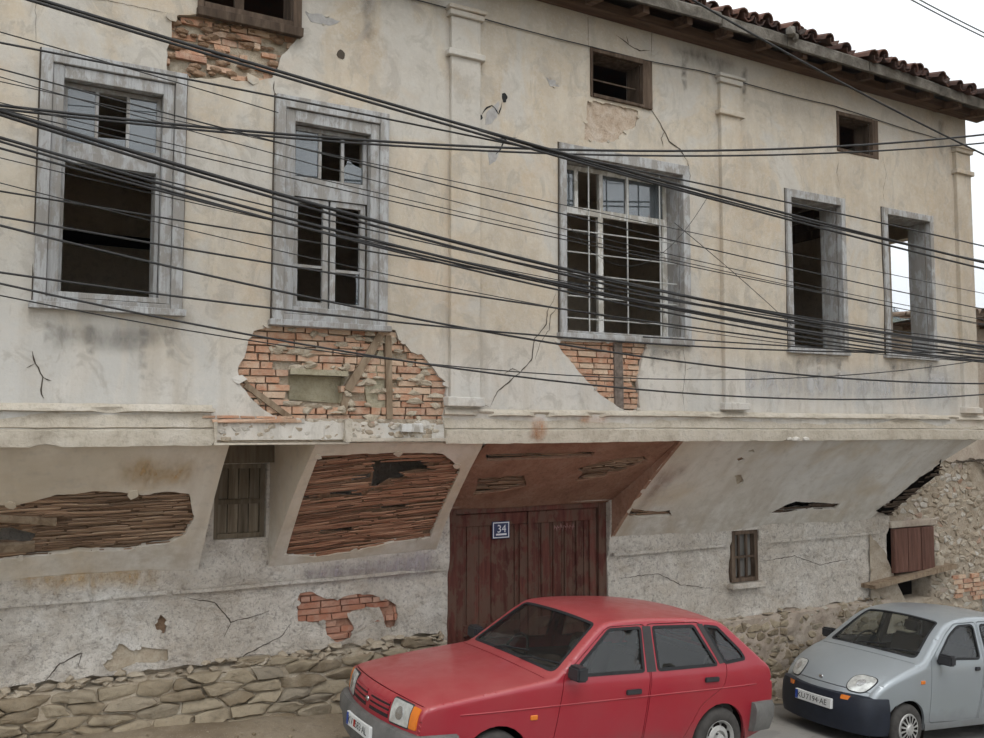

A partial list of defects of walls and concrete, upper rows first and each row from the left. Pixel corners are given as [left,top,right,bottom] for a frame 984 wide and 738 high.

spalling [166,13,296,85]
crack [652,111,689,166]
crack [27,351,51,398]
spalling [202,323,449,443]
crack [486,294,556,407]
spalling [554,339,649,410]
spalling [0,490,194,562]
spalling [283,451,461,559]
spalling [876,460,943,516]
crack [44,653,82,682]
crack [187,597,268,634]
crack [243,626,289,657]